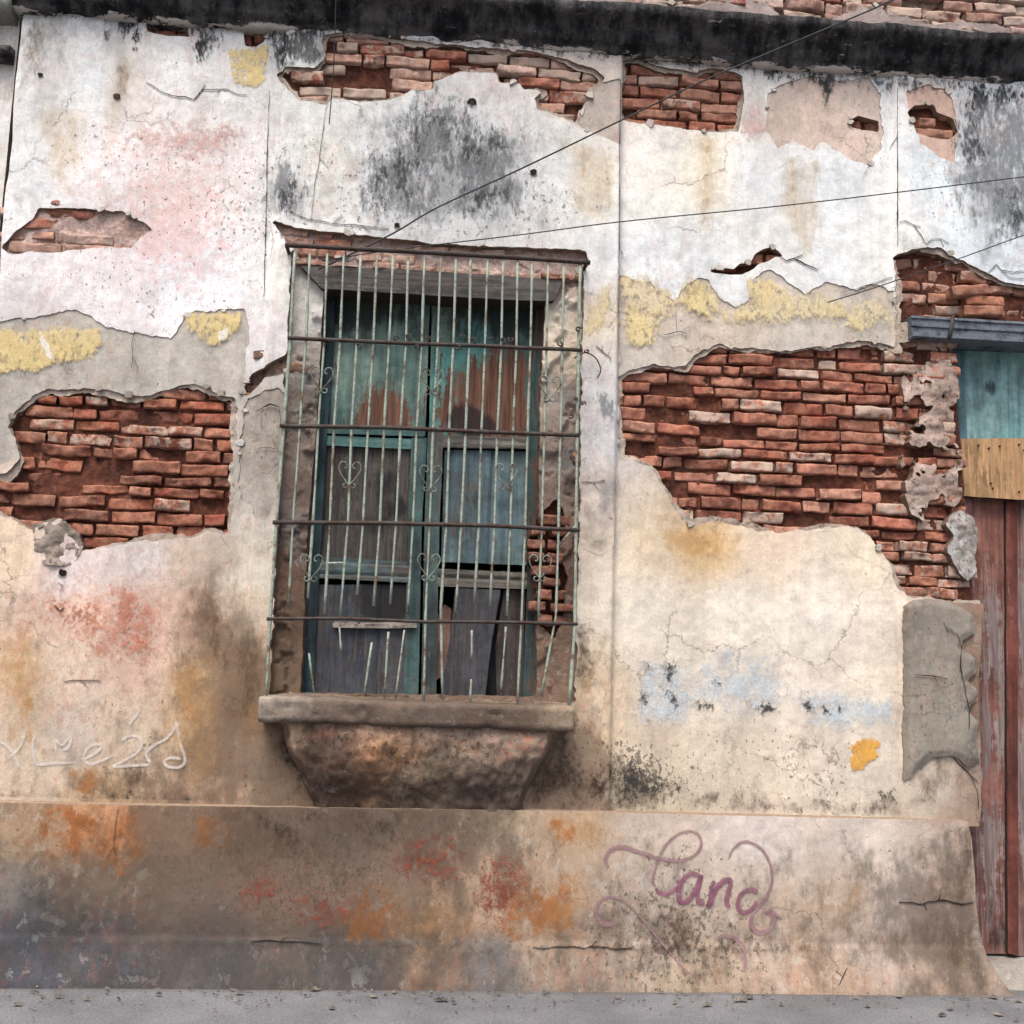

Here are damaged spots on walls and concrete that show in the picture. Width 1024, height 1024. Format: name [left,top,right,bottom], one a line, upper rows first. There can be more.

damp [376,109,448,202]
damp [459,123,505,165]
spalling [277,34,744,144]
peeling [765,76,884,167]
peeling [906,84,958,162]
spalling [0,200,152,262]
damp [469,186,509,211]
spalling [0,308,309,577]
spalling [616,244,1024,604]
damp [611,756,689,806]
crack [899,896,972,909]
crack [535,941,633,950]